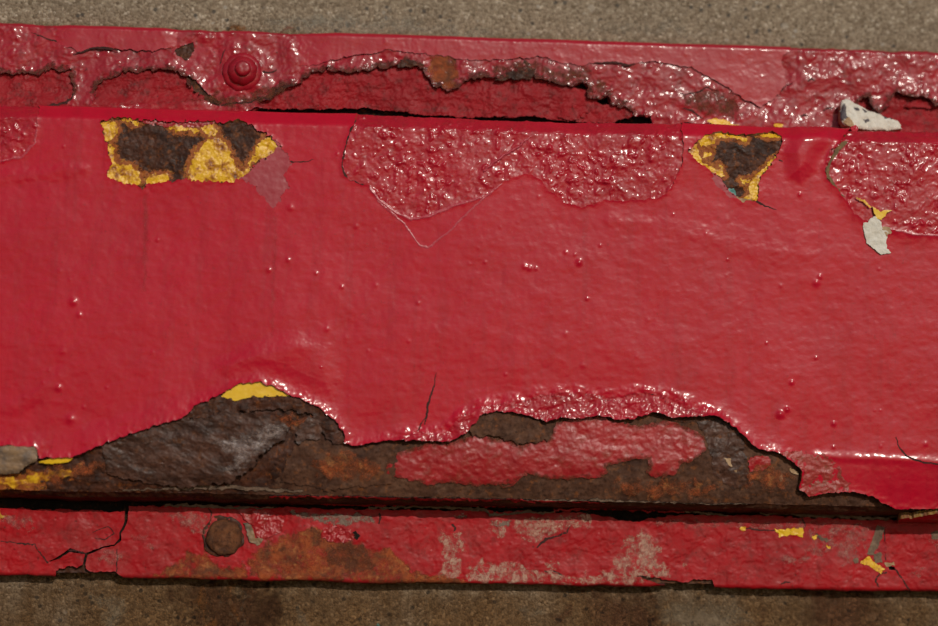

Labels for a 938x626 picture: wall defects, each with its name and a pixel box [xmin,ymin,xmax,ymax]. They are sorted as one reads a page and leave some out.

peeling [0,62,77,107]
peeling [90,42,221,107]
peeling [252,57,651,123]
peeling [855,89,938,133]
peeling [100,118,292,208]
peeling [688,133,783,203]
peeling [856,197,892,255]
peeling [0,381,937,574]
crack [0,502,131,572]
rust [154,527,467,626]
peeling [440,533,713,586]